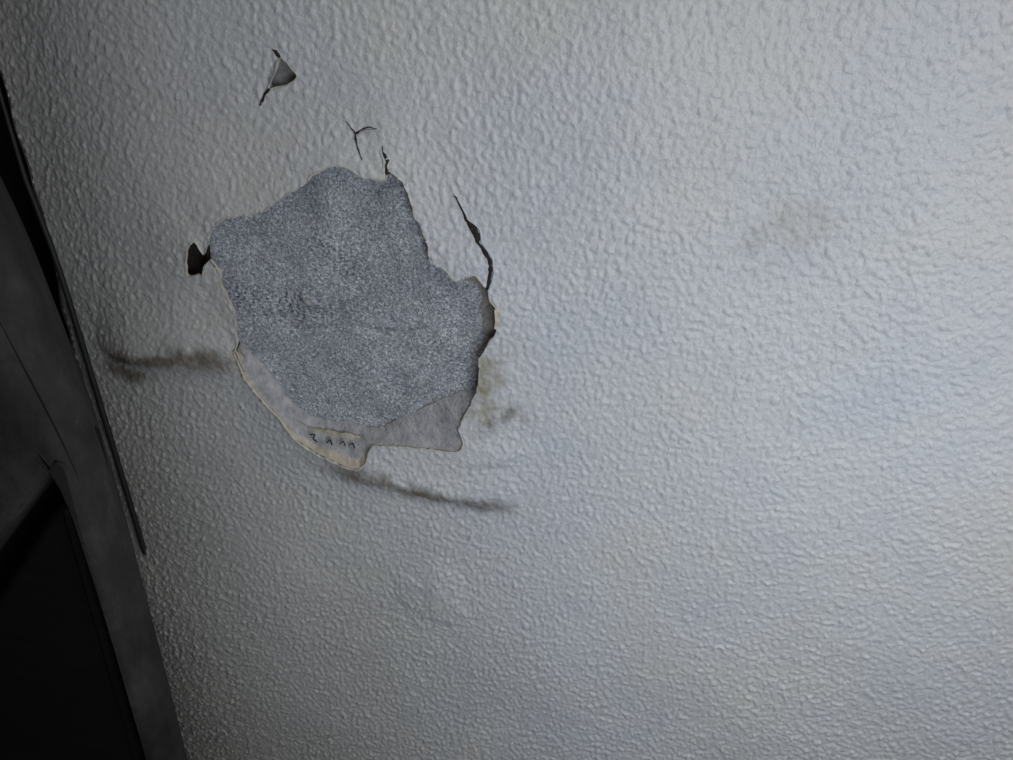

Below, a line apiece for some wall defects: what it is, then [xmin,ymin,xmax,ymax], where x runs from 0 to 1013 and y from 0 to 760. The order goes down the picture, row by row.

peeling [259,49,298,106]
crack [454,195,495,291]
peeling [184,165,504,471]